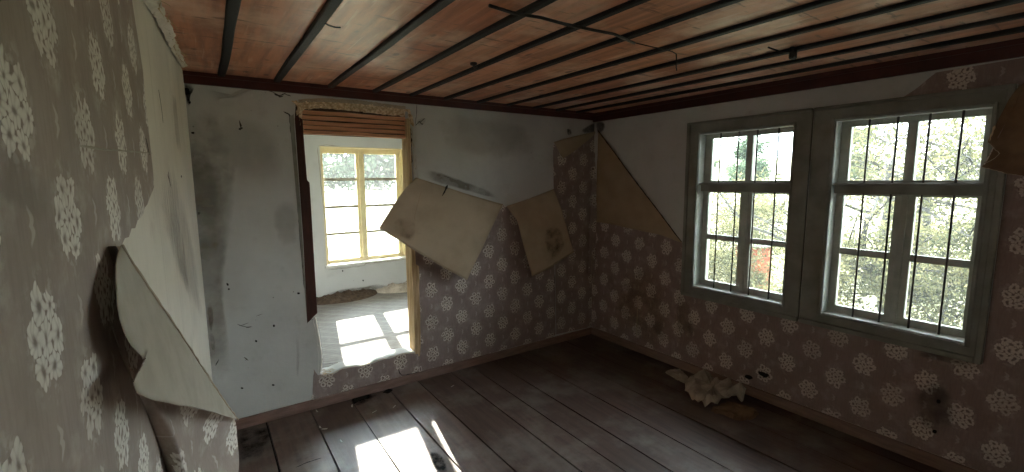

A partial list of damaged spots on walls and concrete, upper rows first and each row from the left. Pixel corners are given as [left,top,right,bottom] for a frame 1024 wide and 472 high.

flaking render [142,0,188,68]